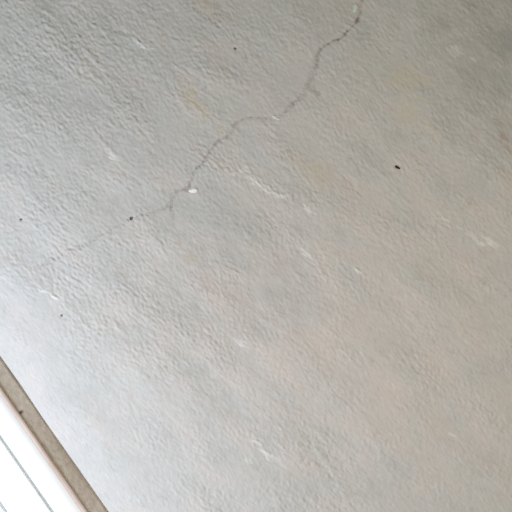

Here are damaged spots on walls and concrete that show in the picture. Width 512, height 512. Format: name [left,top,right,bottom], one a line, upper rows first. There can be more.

crack [40,0,364,267]